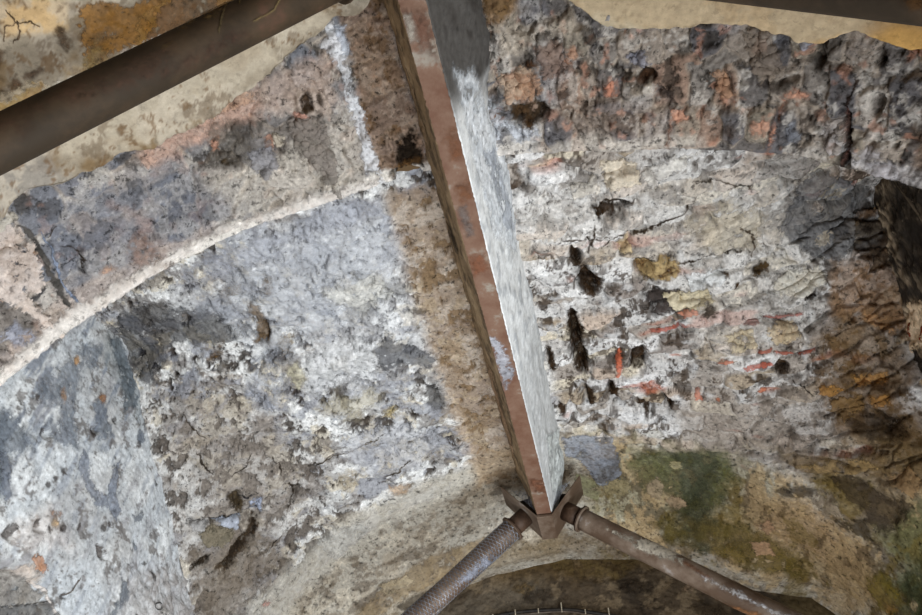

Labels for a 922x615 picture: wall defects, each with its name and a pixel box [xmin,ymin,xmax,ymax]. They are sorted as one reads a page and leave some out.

crack [3,11,40,43]
crack [839,79,859,167]
flaking render [0,212,65,339]
spalling [570,245,604,297]
spalling [616,233,739,333]
flaking render [773,168,857,301]
water stain [844,144,922,282]
spalling [566,308,589,371]
water stain [914,349,922,373]
water stain [819,372,907,443]
water stain [627,451,763,552]
water stain [552,559,654,594]